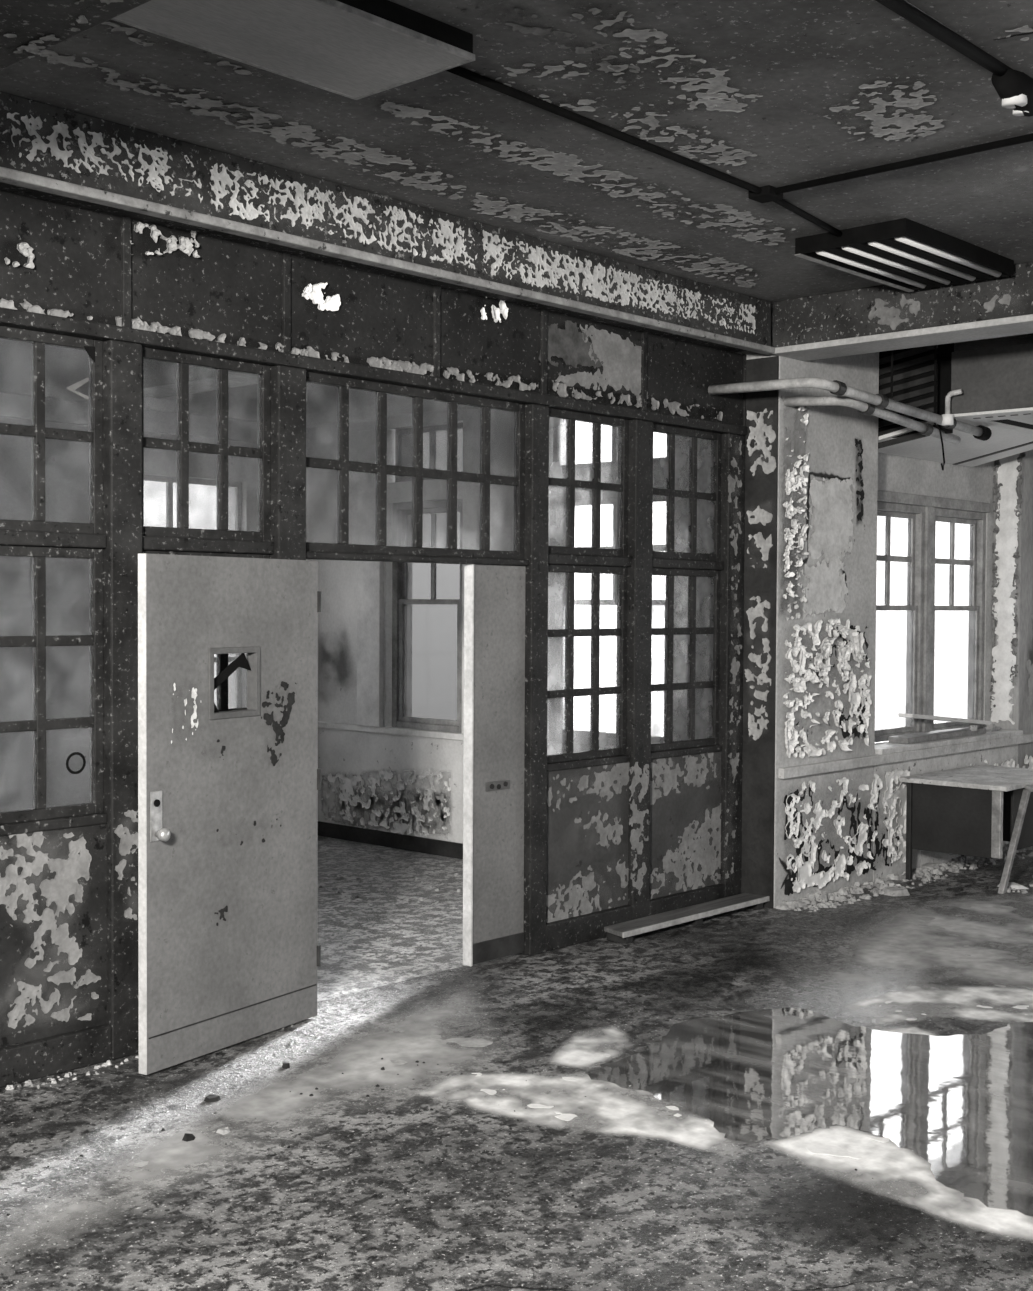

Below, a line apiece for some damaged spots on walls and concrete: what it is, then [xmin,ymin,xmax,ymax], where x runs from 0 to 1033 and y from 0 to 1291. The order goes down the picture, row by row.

peeling [823,77,953,142]
peeling [2,0,796,334]
peeling [0,298,723,421]
peeling [114,810,138,920]
peeling [171,683,198,744]
peeling [261,681,296,766]
peeling [321,768,451,837]
flaking render [546,406,872,923]
peeling [783,767,923,896]
peeling [970,755,1033,769]
peeling [0,831,101,1033]